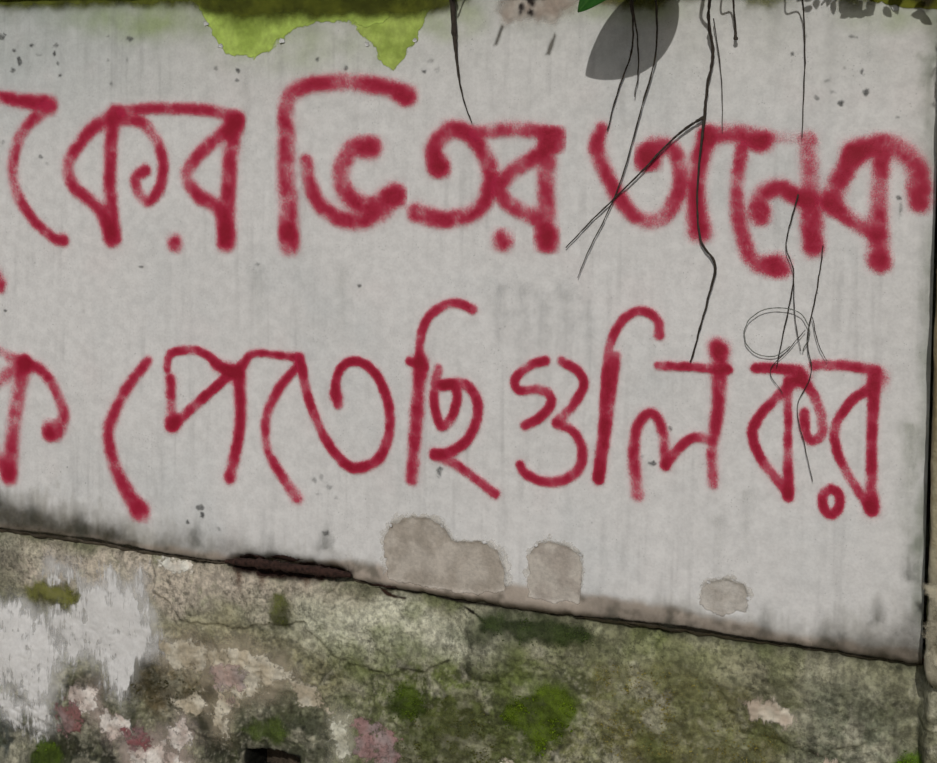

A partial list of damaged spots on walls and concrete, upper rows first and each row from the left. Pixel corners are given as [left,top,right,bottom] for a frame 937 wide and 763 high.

peeling [199,8,428,70]
flaking render [495,0,576,44]
leakage [0,502,135,545]
corrosion [224,554,352,581]
flaking render [380,513,512,595]
flaking render [523,534,585,604]
flaking render [700,575,754,616]
peeling [745,698,797,729]